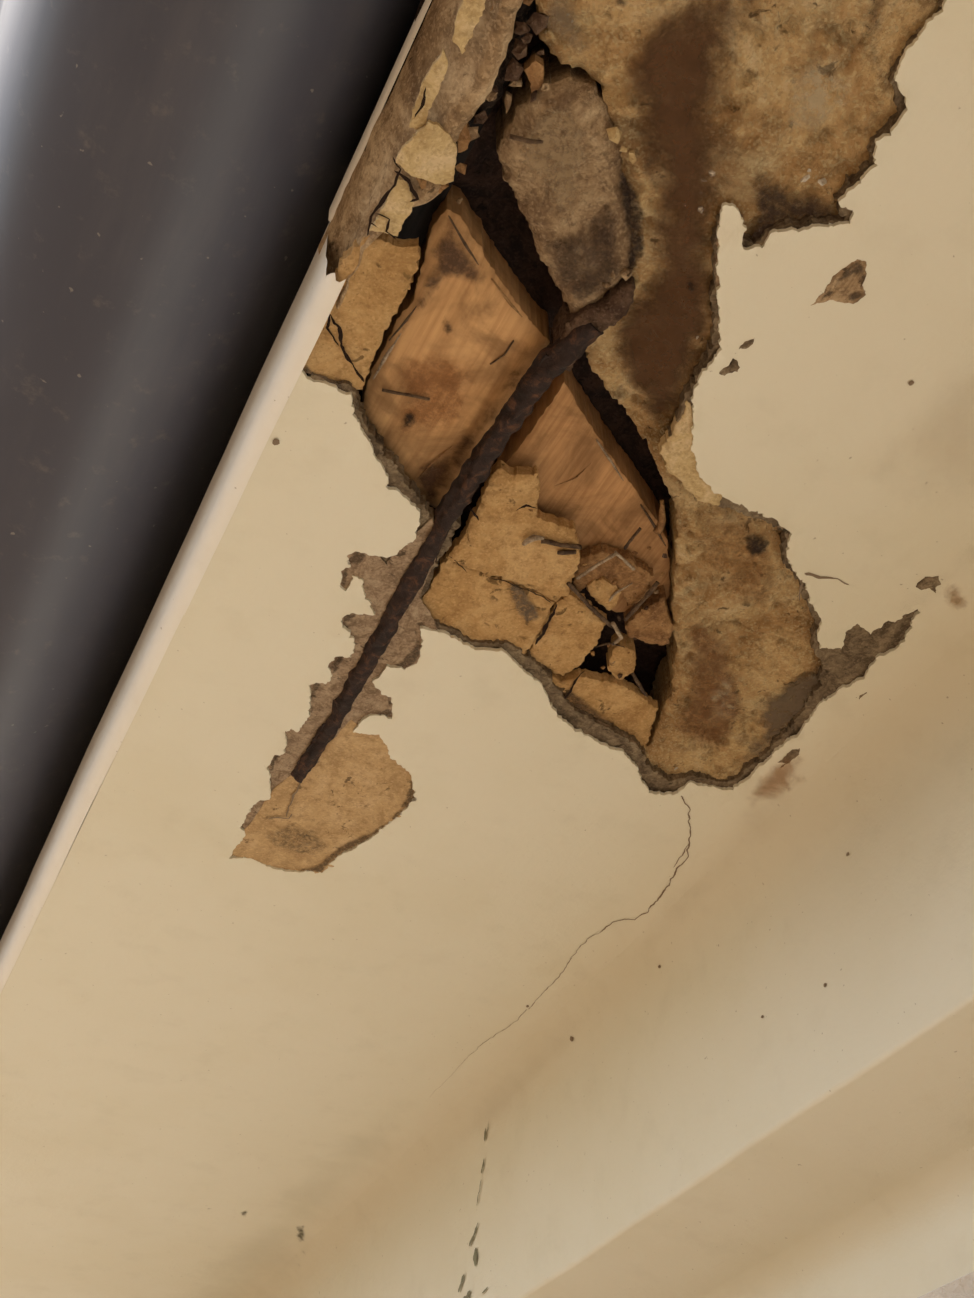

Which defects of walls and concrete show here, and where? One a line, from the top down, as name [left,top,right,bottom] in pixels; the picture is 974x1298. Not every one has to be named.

corrosion [291,323,604,783]
spalling [231,0,944,874]
crack [440,796,691,1087]